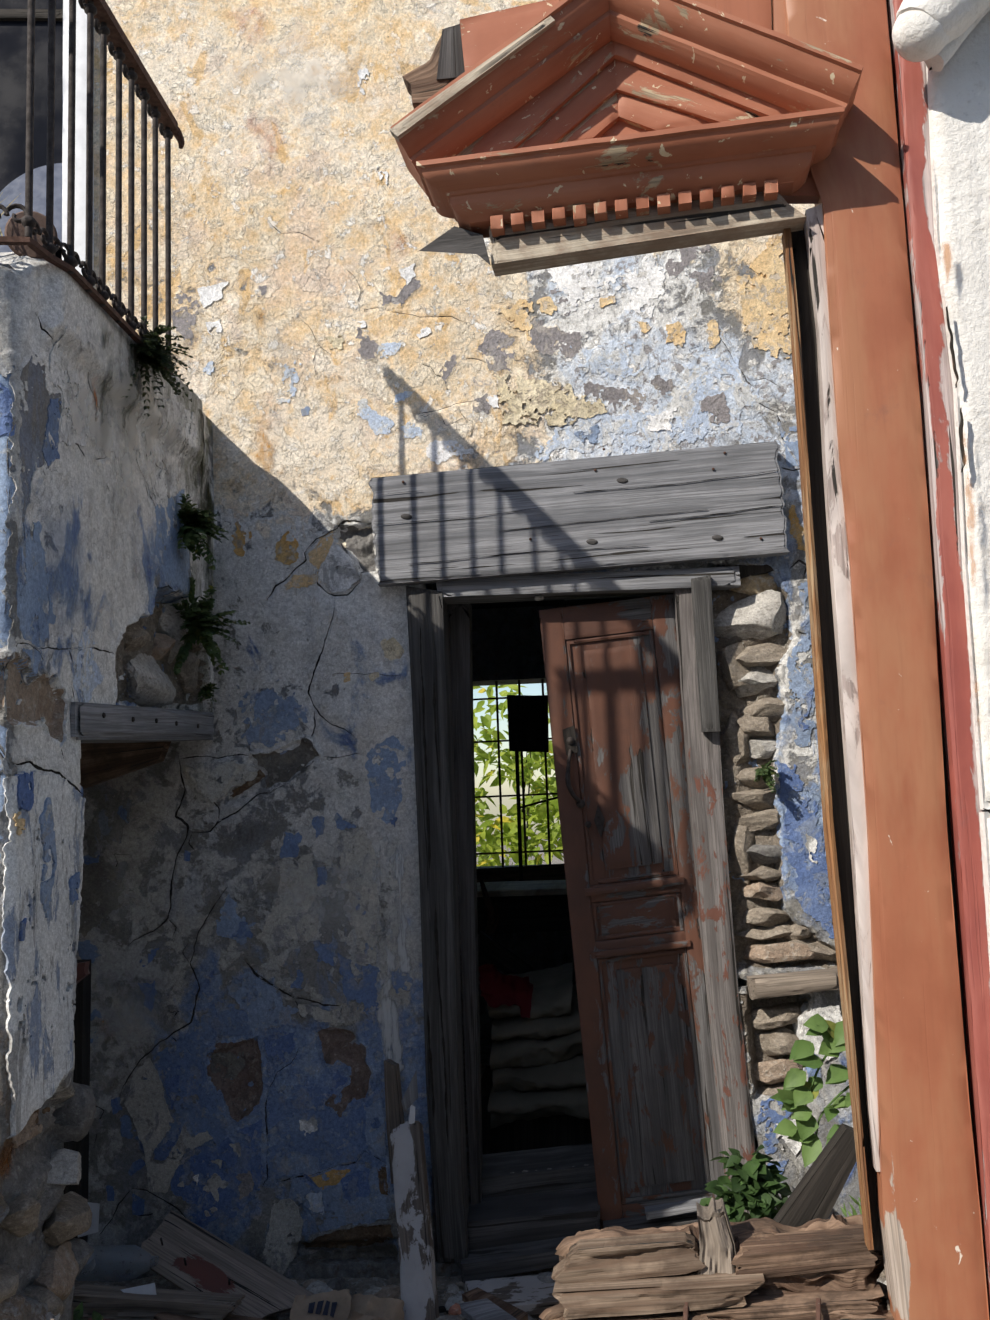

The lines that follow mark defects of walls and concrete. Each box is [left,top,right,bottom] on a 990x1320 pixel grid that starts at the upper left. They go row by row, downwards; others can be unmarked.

peeling [171,281,229,351]
peeling [325,320,431,363]
peeling [372,263,424,313]
peeling [437,236,792,463]
peeling [0,347,139,971]
spalling [114,398,325,797]
flaking render [268,522,378,593]
crack [92,515,406,1147]
flaking render [203,732,415,1128]
flaking render [703,558,843,1175]
flaking render [0,1007,85,1297]
peeling [263,1151,400,1279]